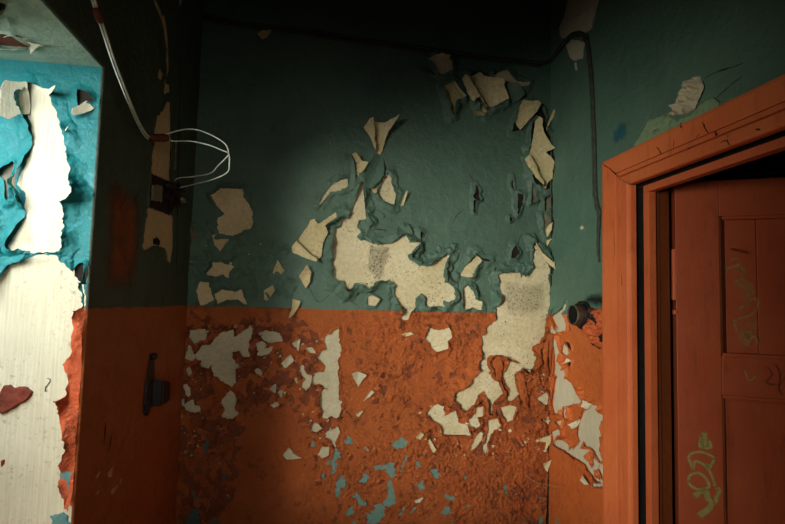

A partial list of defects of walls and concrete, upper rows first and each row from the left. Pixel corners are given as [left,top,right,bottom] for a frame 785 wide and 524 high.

peeling [0,0,42,54]
peeling [0,69,100,524]
flaking render [140,0,174,266]
peeling [177,51,603,524]